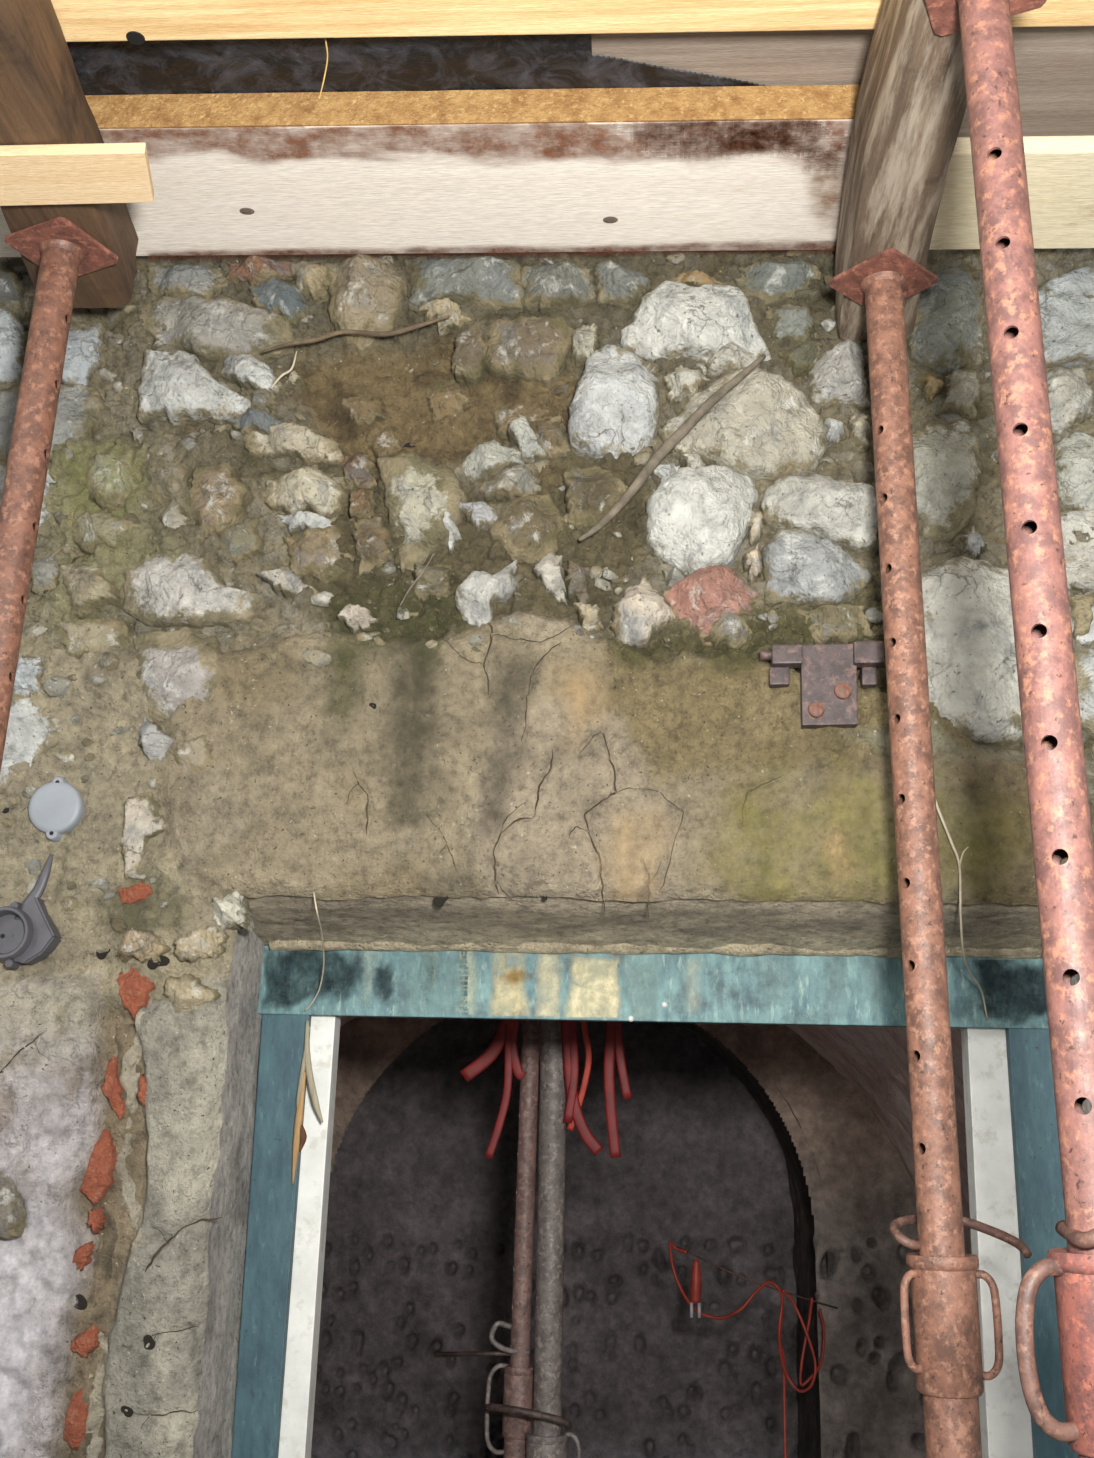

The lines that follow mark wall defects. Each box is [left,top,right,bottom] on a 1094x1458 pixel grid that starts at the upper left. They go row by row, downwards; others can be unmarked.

crack [443,623,684,919]
flaking render [63,955,170,1458]
crack [120,1410,198,1458]